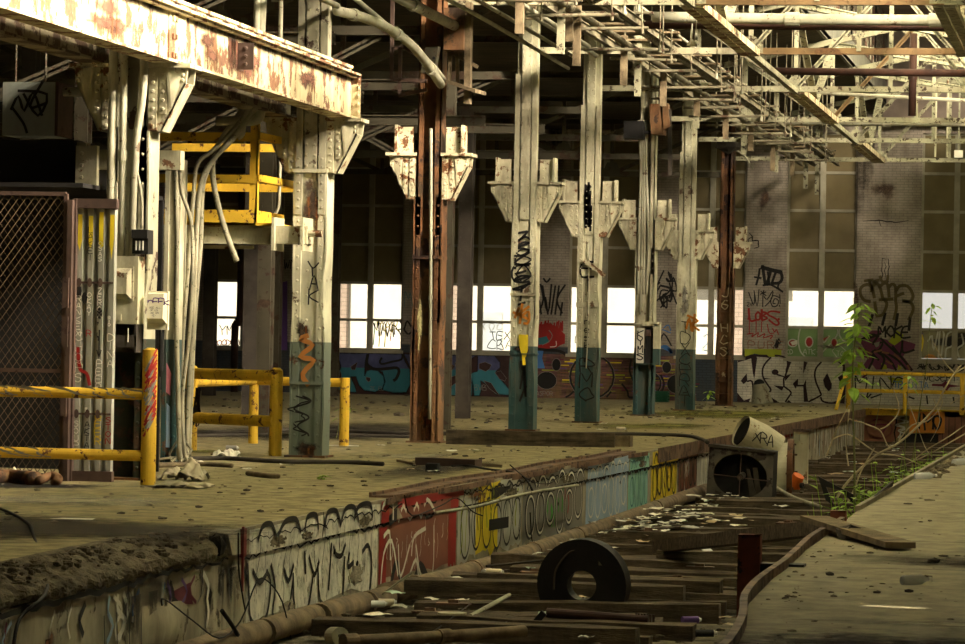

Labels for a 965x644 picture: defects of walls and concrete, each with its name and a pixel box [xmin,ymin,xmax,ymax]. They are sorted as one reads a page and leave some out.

rust [229,37,238,67]